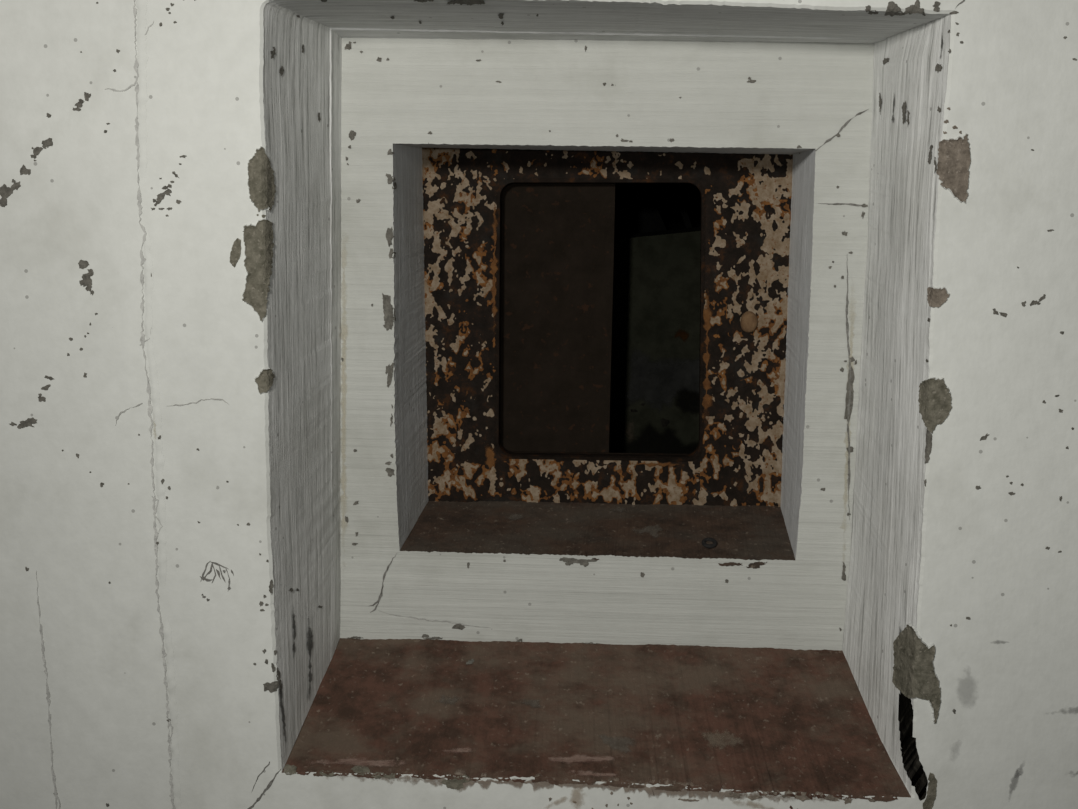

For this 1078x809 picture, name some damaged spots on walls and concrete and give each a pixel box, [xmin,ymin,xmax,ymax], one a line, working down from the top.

peeling [865,0,963,53]
flaking render [928,106,971,204]
flaking render [230,146,276,322]
flaking render [254,367,275,394]
corrosion [427,173,792,506]
flaking render [918,377,952,463]
crack [370,555,490,630]
crack [248,689,286,809]
flaking render [892,624,956,809]